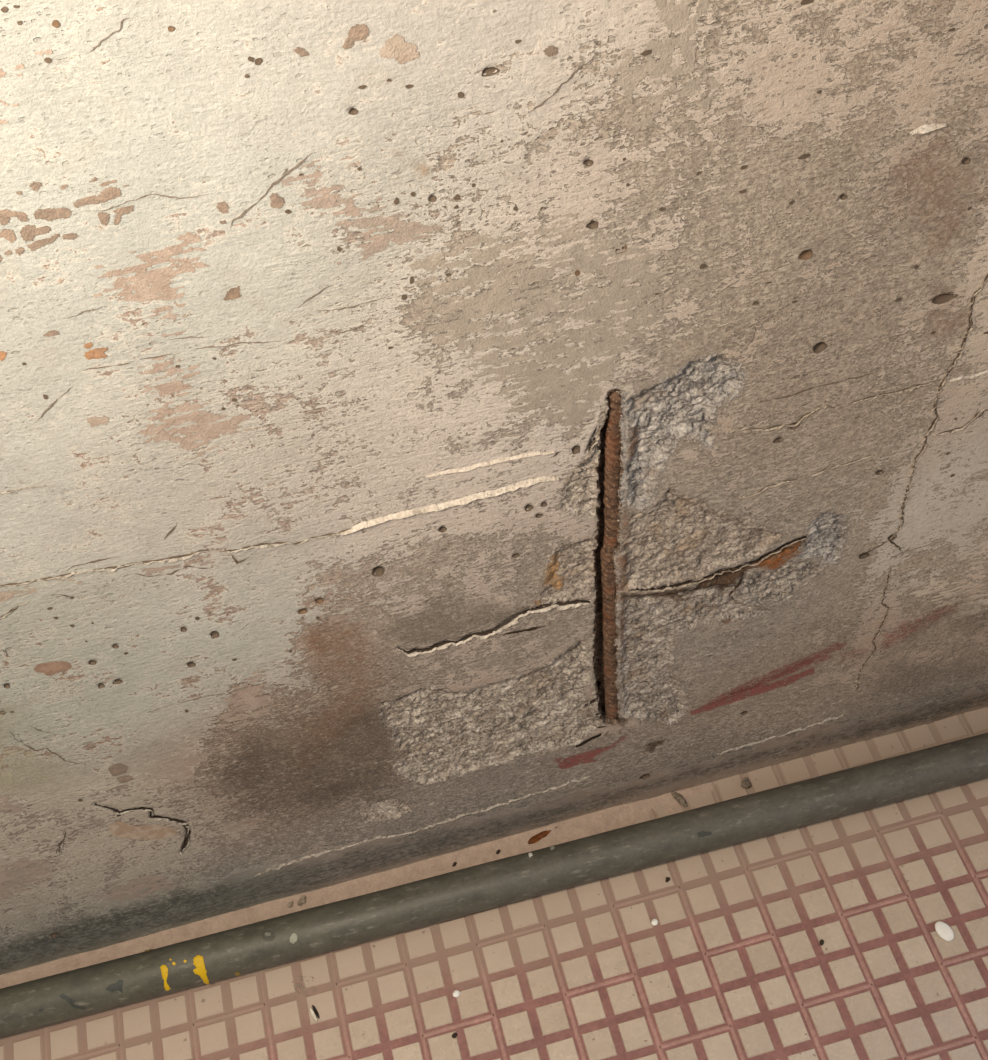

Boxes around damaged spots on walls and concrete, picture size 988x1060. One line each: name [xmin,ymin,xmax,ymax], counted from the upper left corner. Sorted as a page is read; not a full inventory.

peeling [0,177,134,262]
peeling [270,160,850,786]
crack [730,275,988,690]
crack [0,523,353,619]
crack [620,536,807,604]
crack [398,600,590,657]
crack [94,803,191,853]